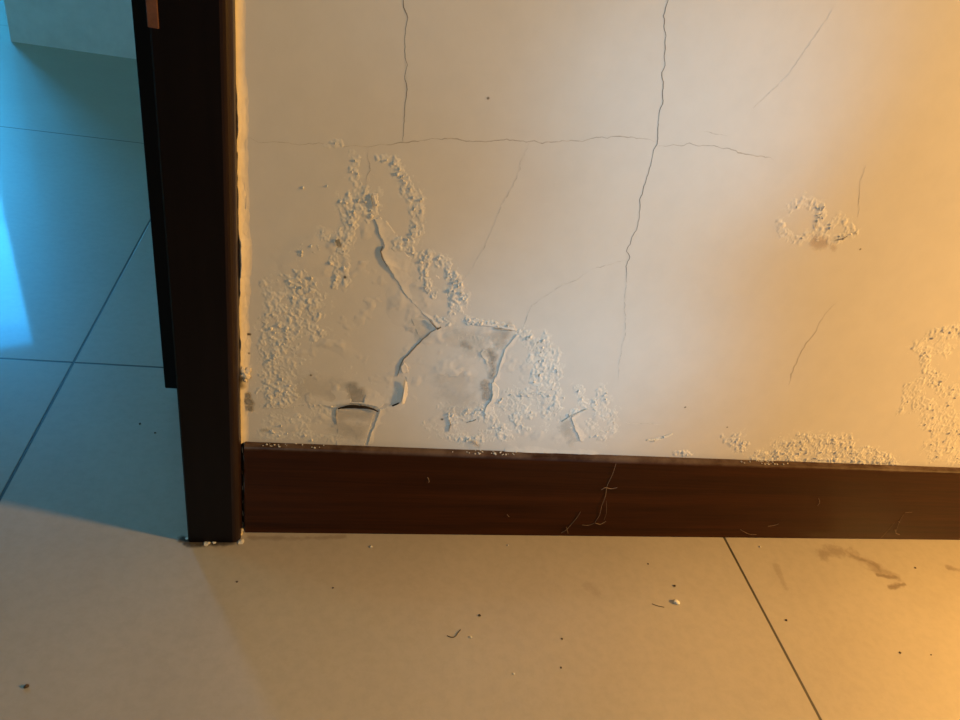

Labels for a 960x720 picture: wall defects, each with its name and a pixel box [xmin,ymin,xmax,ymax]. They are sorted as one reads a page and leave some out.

peeling [240,217,620,455]
crack [253,0,771,377]